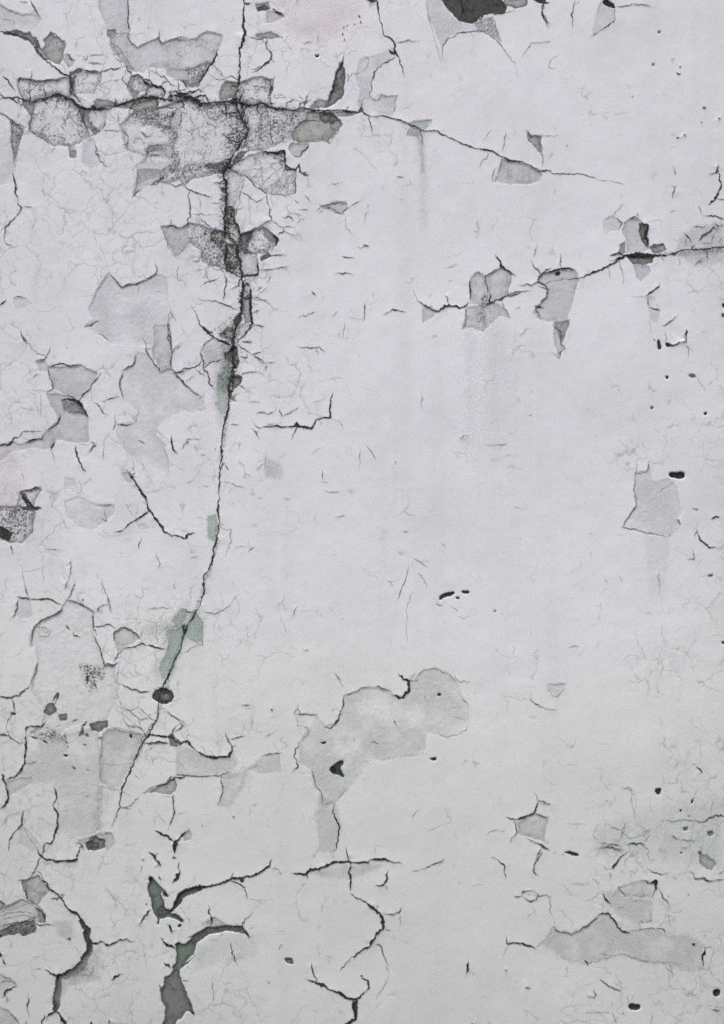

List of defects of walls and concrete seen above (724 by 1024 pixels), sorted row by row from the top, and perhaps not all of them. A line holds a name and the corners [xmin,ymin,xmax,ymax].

spalling [426,0,550,66]
spalling [0,0,361,529]
crack [297,164,724,356]
peeling [532,254,578,358]
crack [0,0,624,827]
spalling [0,486,42,555]
crack [0,678,145,1024]
peeling [0,587,251,1024]
crack [173,849,443,1024]
peeling [293,668,471,851]
crack [472,857,549,902]
crack [503,934,540,955]